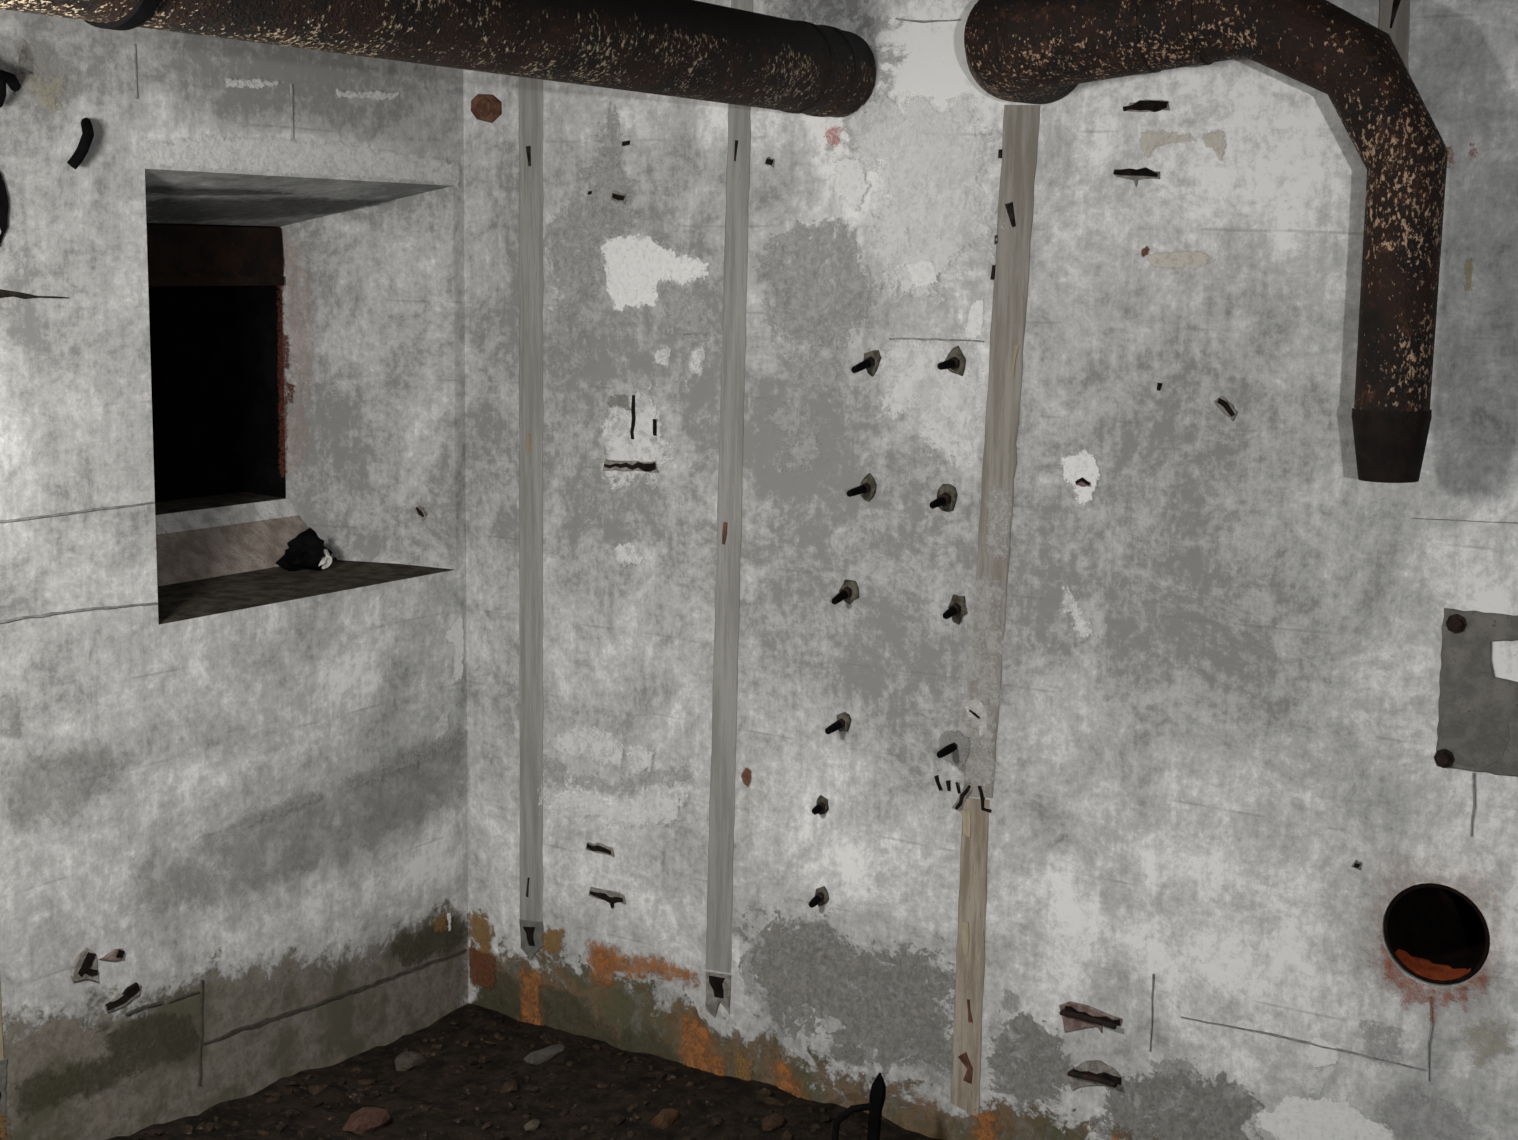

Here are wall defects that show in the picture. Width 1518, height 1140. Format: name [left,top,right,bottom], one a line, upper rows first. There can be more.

peeling [600,233,714,311]
peeling [653,346,670,365]
peeling [685,344,709,383]
corrosion [518,925,564,1025]
leakage [0,899,1160,1140]
corrosion [585,940,700,990]
corrosion [679,1015,811,1101]
peeling [987,990,1396,1140]
corrosion [1380,935,1495,1024]